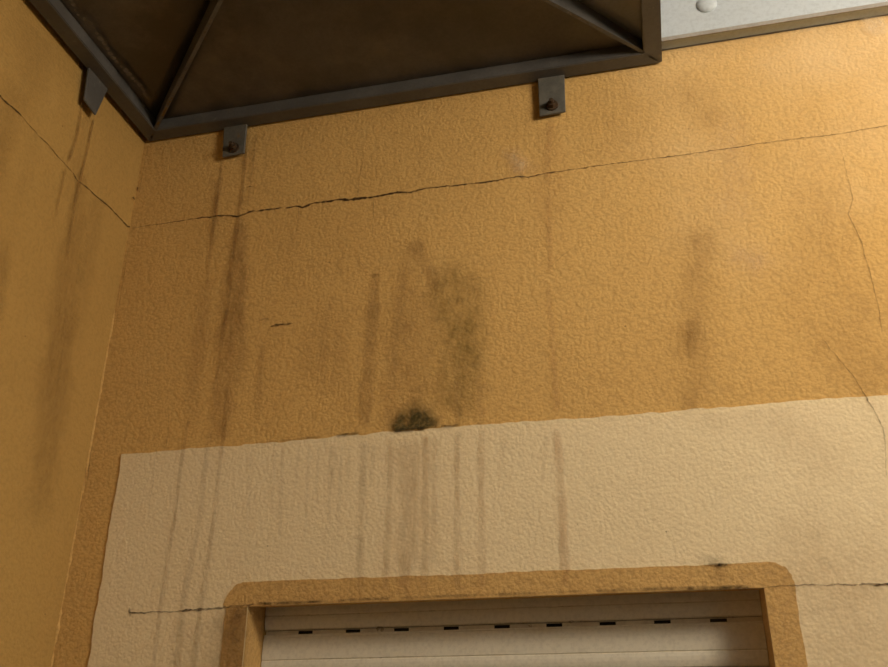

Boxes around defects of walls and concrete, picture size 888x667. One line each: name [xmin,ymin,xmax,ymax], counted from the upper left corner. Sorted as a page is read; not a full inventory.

crack [0,95,561,227]
crack [838,580,888,588]
crack [129,604,253,614]